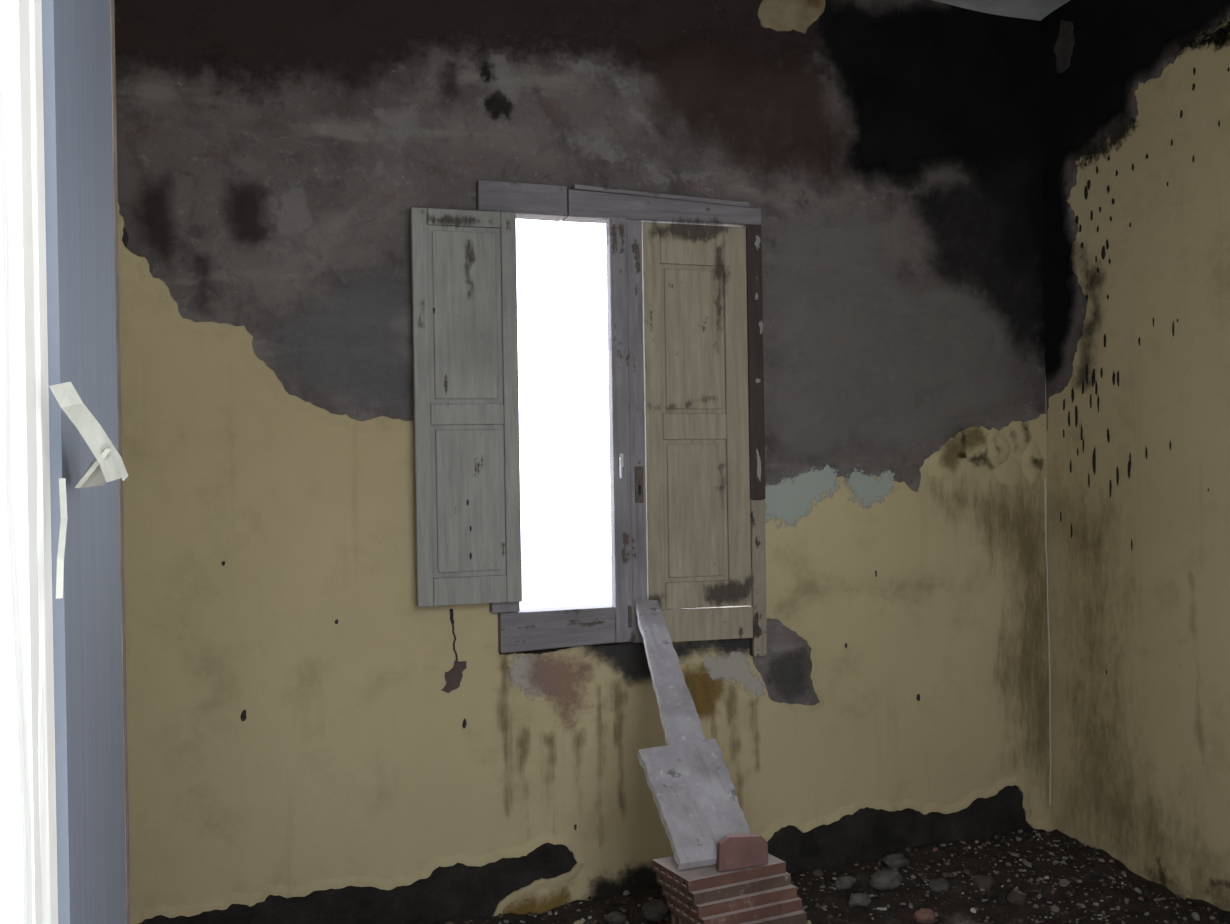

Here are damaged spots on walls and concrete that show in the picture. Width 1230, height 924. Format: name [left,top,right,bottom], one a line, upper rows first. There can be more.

peeling [115,0,1230,502]
damp [1063,365,1119,487]
damp [1110,447,1147,498]
damp [502,653,591,719]
damp [685,667,734,716]
flaking render [753,618,825,712]
damp [990,503,1050,751]
flaking render [761,776,1049,873]
flaking render [131,832,586,924]